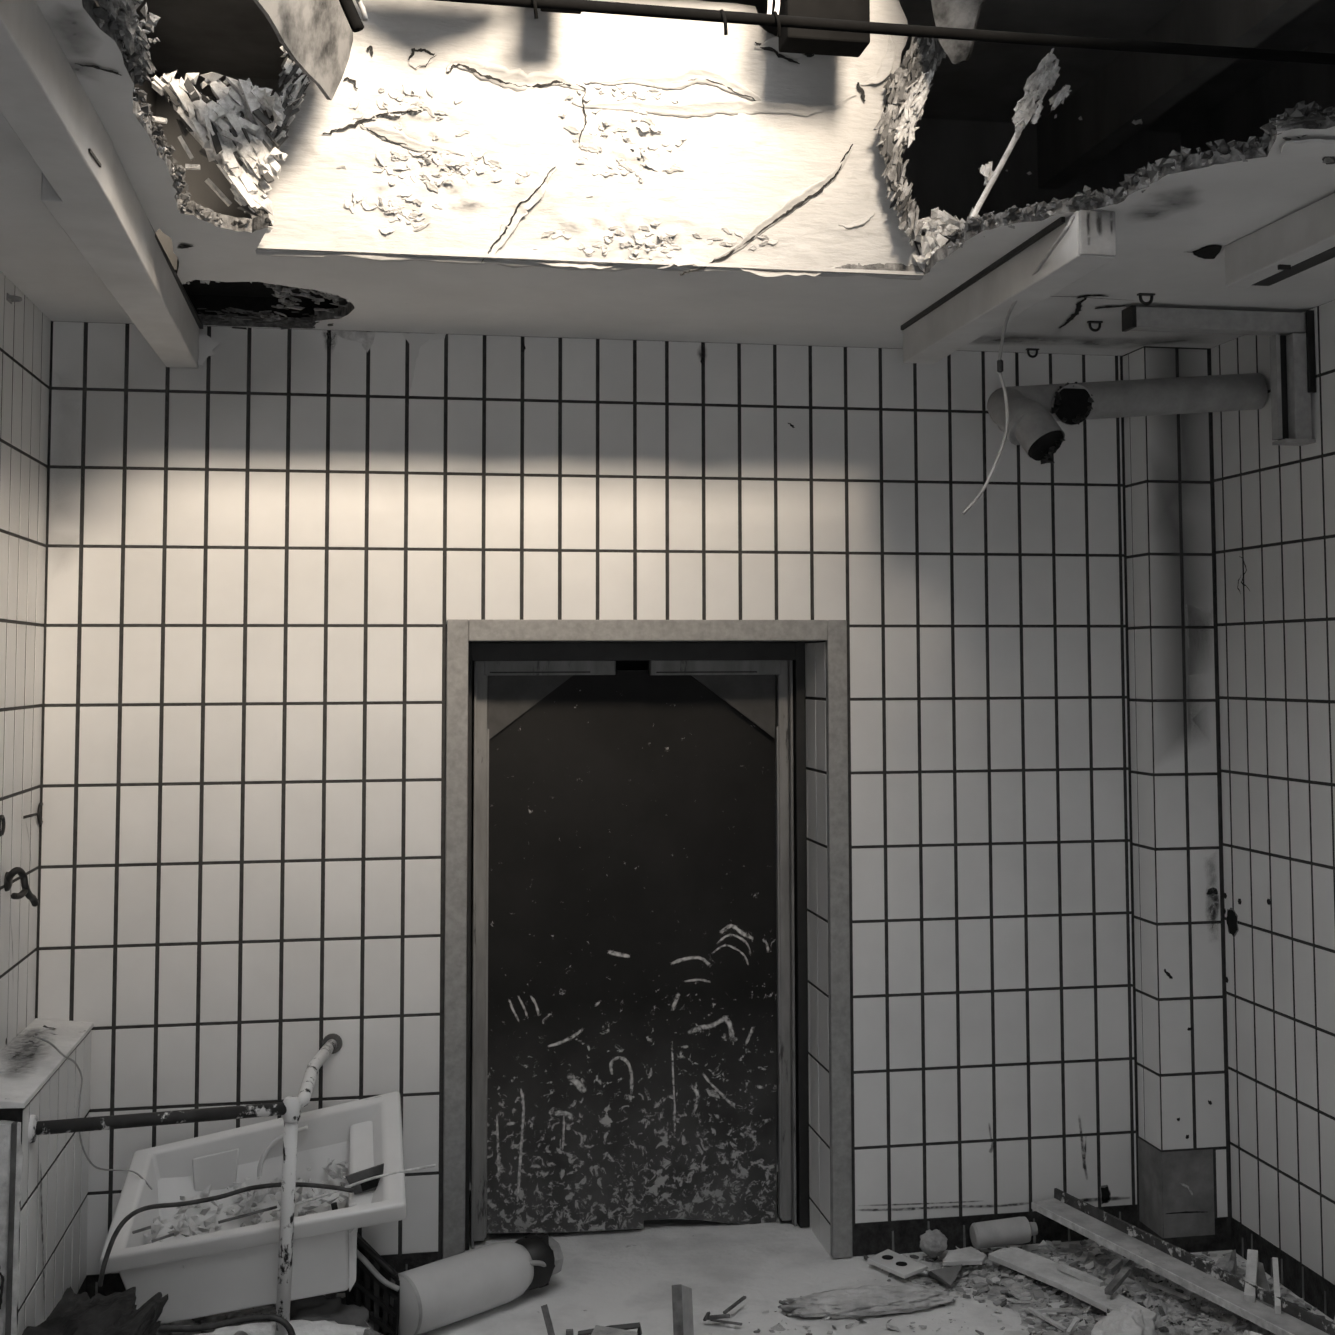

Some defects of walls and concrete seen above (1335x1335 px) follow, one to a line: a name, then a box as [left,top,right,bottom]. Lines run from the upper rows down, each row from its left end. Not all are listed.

flaking render [93,0,310,234]
crack [323,110,465,156]
peeling [343,77,530,235]
crack [481,166,557,263]
crack [680,144,853,276]
flaking render [408,35,1335,272]
flaking render [175,270,350,330]
damp [1164,414,1204,728]
flaking render [0,1108,24,1335]